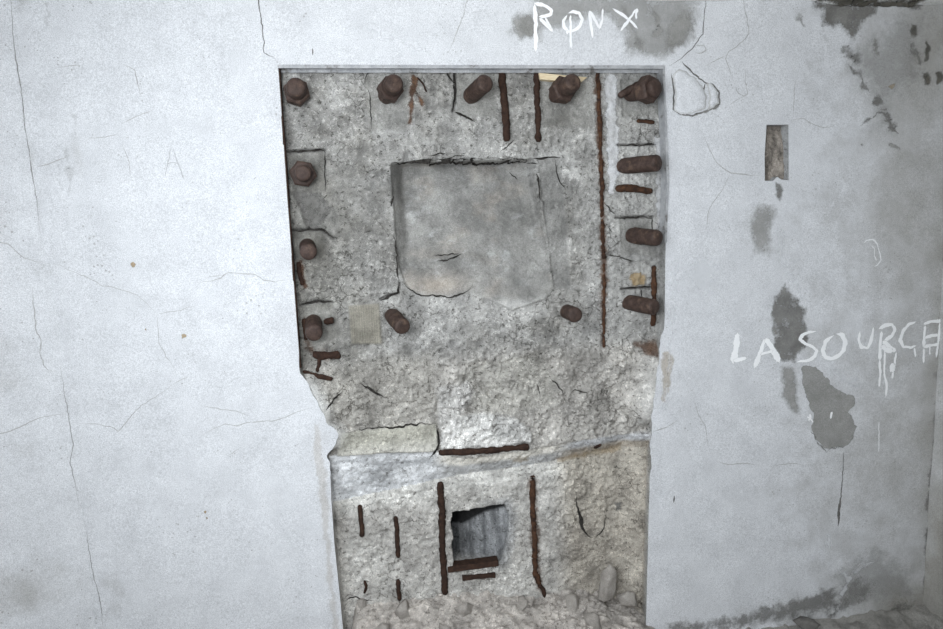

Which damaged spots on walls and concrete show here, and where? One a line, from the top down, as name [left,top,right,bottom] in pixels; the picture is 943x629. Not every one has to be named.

leakage [513,0,692,54]
leakage [815,1,878,36]
leakage [911,26,943,85]
crack [11,6,67,229]
corrosion [407,75,424,124]
leakage [850,67,896,131]
corrosion [593,78,608,342]
crack [302,298,332,306]
corrosion [636,341,658,356]
leakage [771,287,808,412]
crack [202,383,385,457]
crack [836,454,844,525]